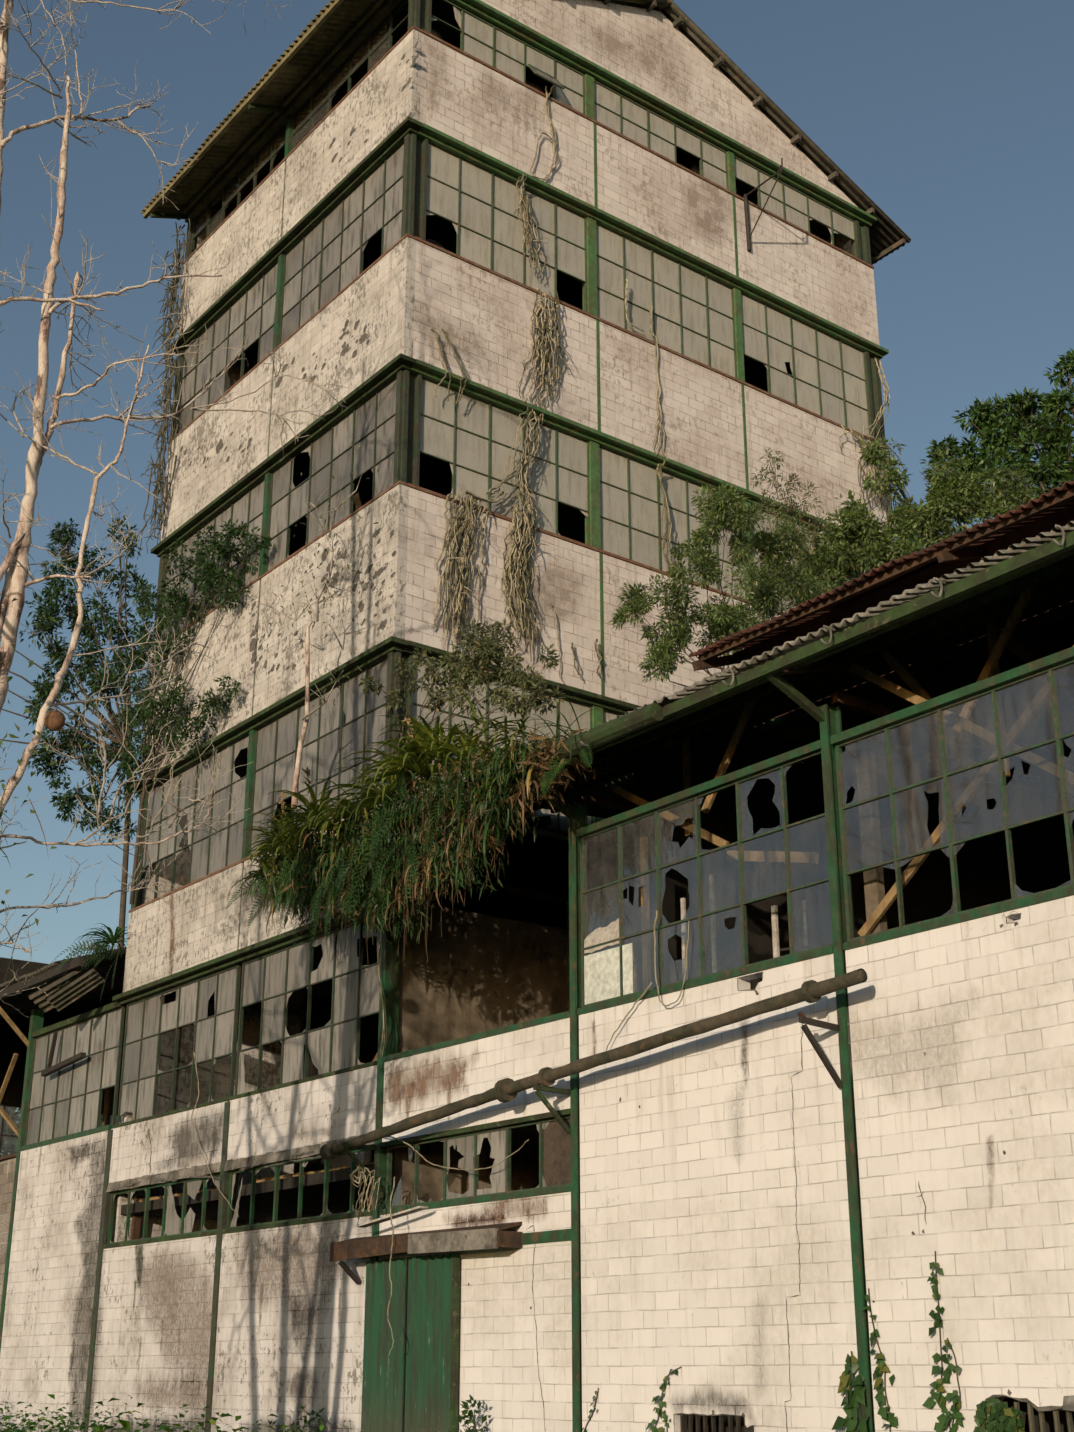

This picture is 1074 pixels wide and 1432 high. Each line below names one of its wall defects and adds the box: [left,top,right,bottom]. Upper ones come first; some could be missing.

water stain [105,1244,212,1432]
water stain [236,1223,357,1354]